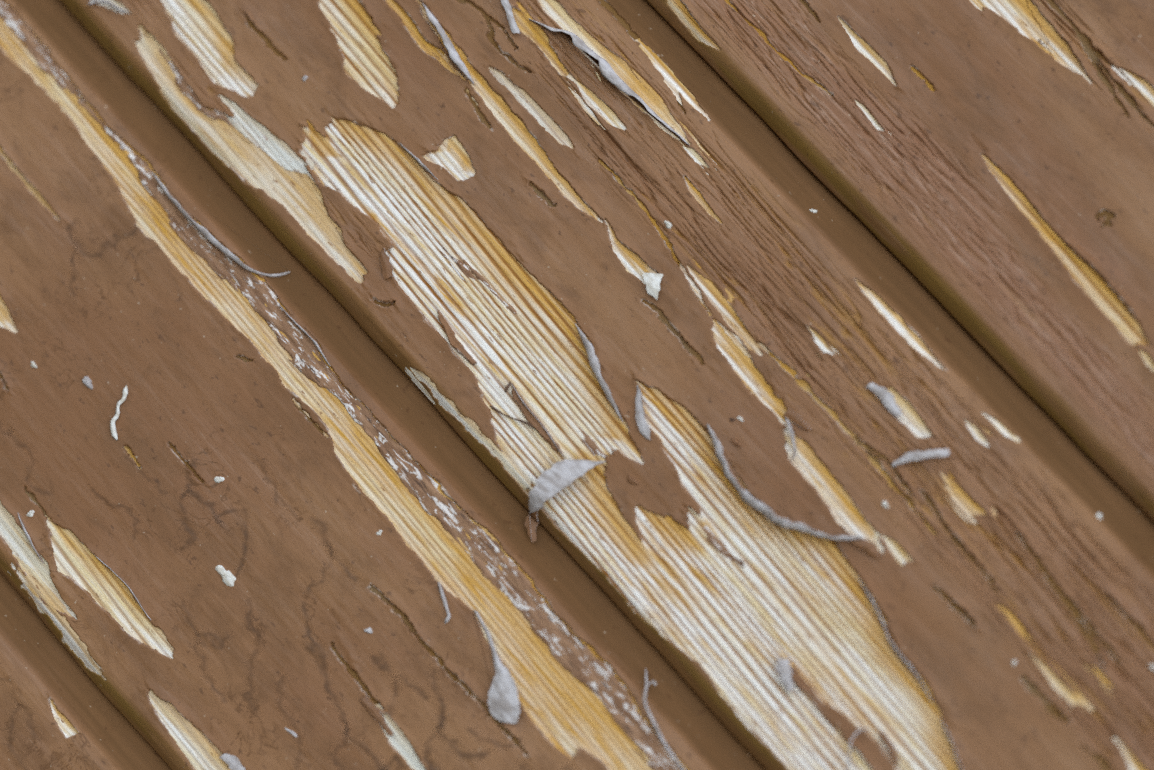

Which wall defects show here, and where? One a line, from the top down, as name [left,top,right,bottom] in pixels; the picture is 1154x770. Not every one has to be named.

peeling [89,0,131,14]
peeling [969,0,1091,82]
peeling [0,147,60,221]
peeling [0,296,18,333]
crack [374,299,395,307]
peeling [981,154,1154,371]
peeling [135,0,964,770]
crack [457,0,1154,770]
peeling [941,471,996,524]
peeling [0,501,174,680]
crack [369,585,529,757]
peeling [50,699,78,738]